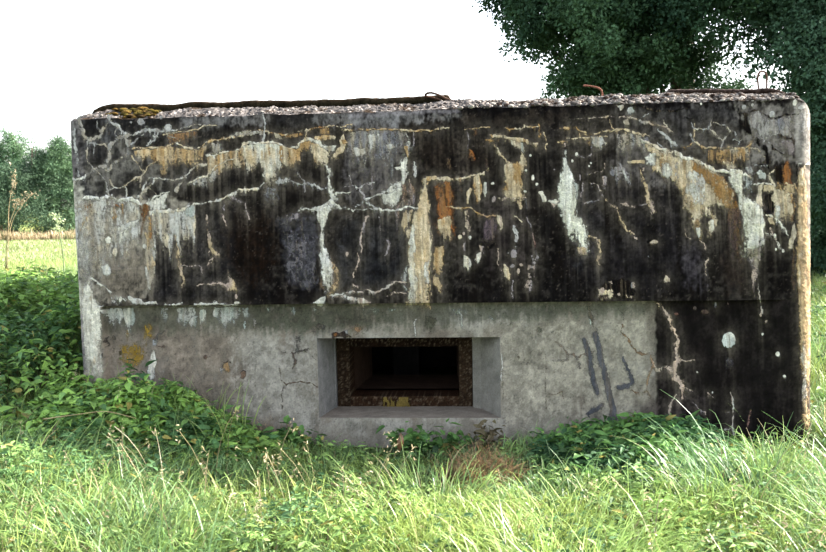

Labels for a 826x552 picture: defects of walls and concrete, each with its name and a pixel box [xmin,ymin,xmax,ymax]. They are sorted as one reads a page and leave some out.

damp [74,191,256,376]
crack [72,115,418,307]
damp [187,130,444,336]
rust [422,159,489,239]
damp [458,134,539,299]
damp [538,143,587,255]
crack [578,147,655,240]
crack [578,101,744,149]
damp [594,111,811,430]
rust [687,141,799,220]
peeling [737,99,805,158]
crack [620,303,751,435]